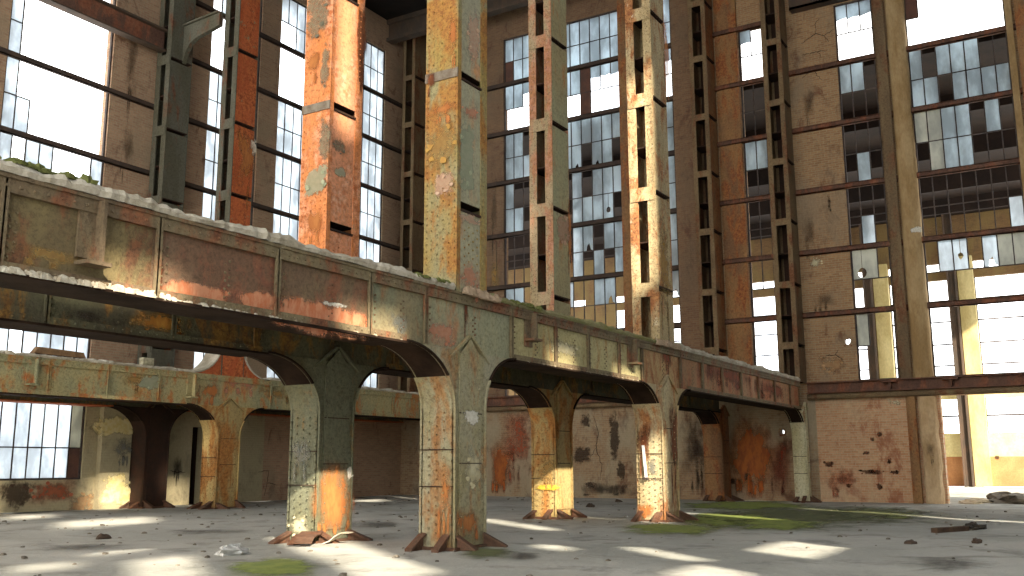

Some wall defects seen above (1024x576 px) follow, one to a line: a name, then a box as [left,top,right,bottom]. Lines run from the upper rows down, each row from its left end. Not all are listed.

corrosion [308,53,319,83]
corrosion [357,10,367,92]
peeling [305,119,346,196]
peeling [425,106,478,196]
corrosion [308,212,321,244]
corrosion [160,265,367,338]
corrosion [492,418,554,492]
corrosion [730,423,788,496]
corrosion [315,466,355,535]